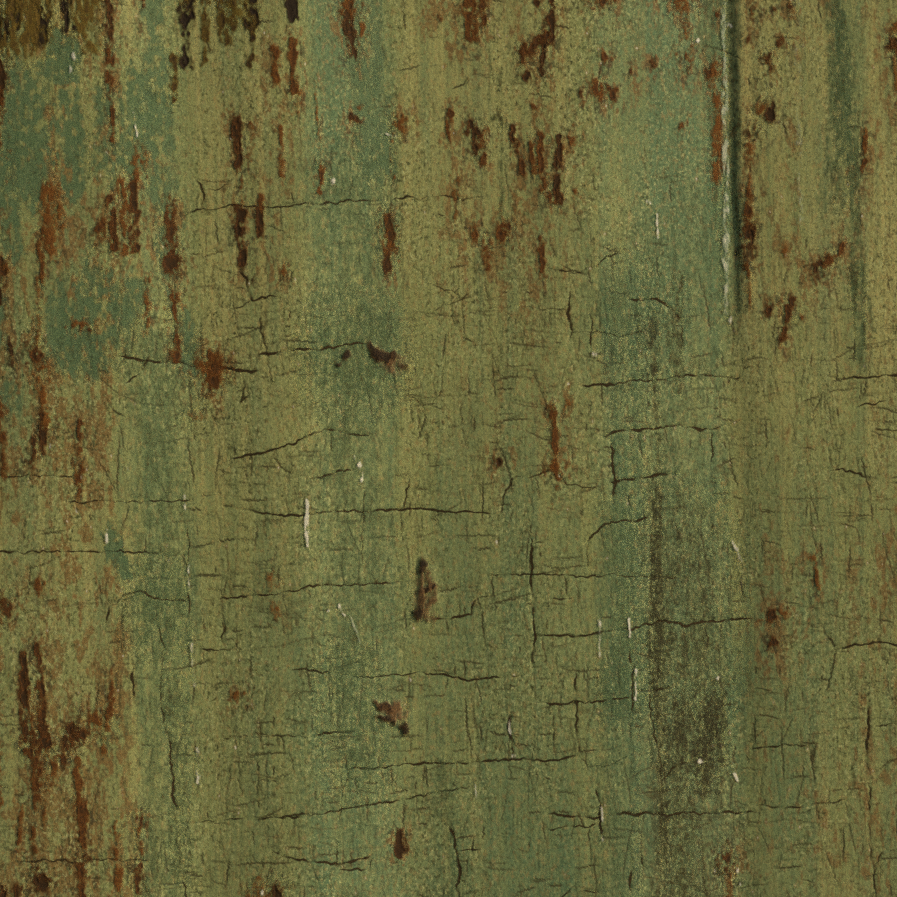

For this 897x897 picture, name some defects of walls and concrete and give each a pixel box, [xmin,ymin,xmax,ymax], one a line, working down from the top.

rust [341,0,366,59]
rust [94,146,147,257]
rust [162,196,182,277]
crack [170,180,368,214]
rust [510,124,576,205]
rust [741,99,779,306]
crack [122,272,364,402]
crack [222,424,750,663]
rust [17,642,115,897]
crack [274,851,372,871]
crack [262,653,698,820]
crack [550,789,842,835]